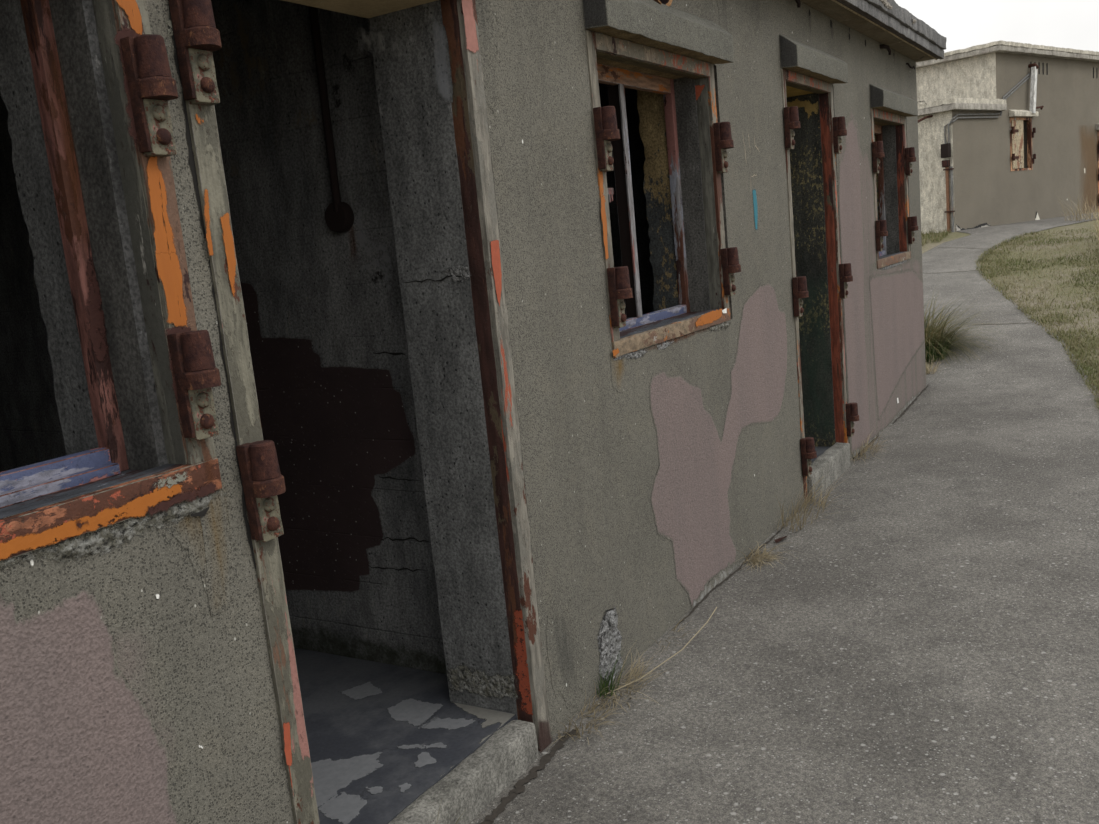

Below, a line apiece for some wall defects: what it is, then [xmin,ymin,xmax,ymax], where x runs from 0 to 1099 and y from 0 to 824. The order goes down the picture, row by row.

peeling [116,0,143,35]
peeling [146,156,187,327]
peeling [204,189,236,296]
crack [405,275,469,283]
peeling [696,308,731,332]
peeling [0,472,226,569]
peeling [339,681,382,700]
spalling [387,609,533,744]
spalling [597,607,623,685]
peeling [311,752,384,824]
peeling [397,742,447,768]